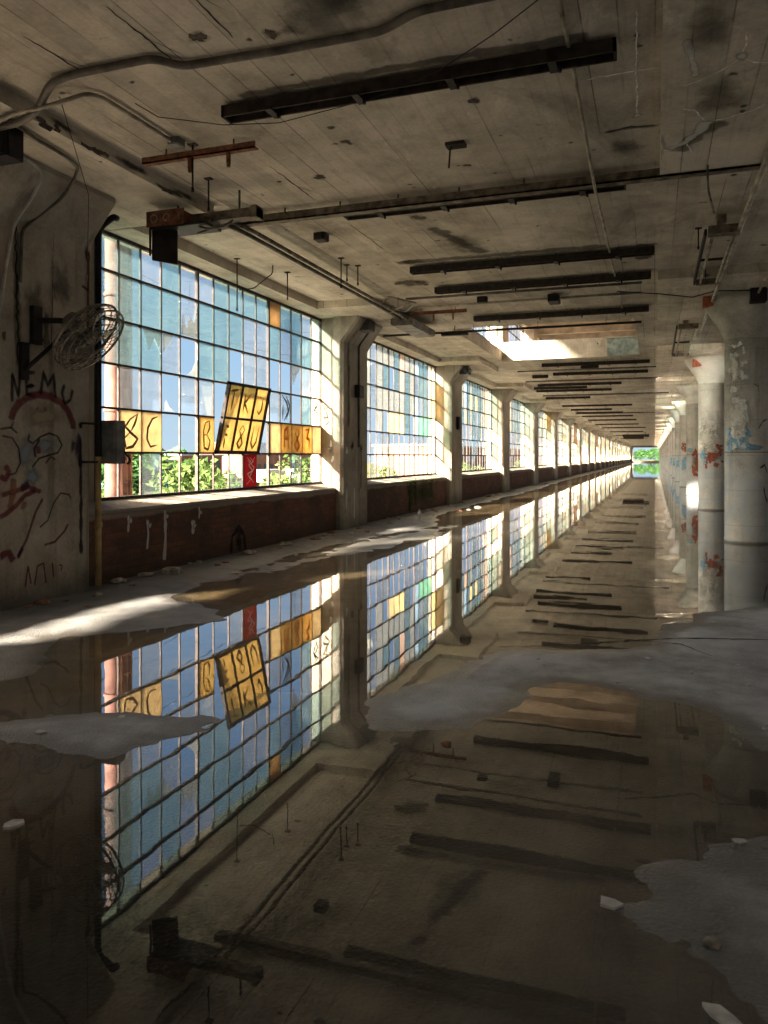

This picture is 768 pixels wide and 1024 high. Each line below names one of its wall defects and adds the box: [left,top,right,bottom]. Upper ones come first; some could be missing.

crack [106,6,180,59]
water stain [297,0,358,28]
peeling [670,341,761,477]